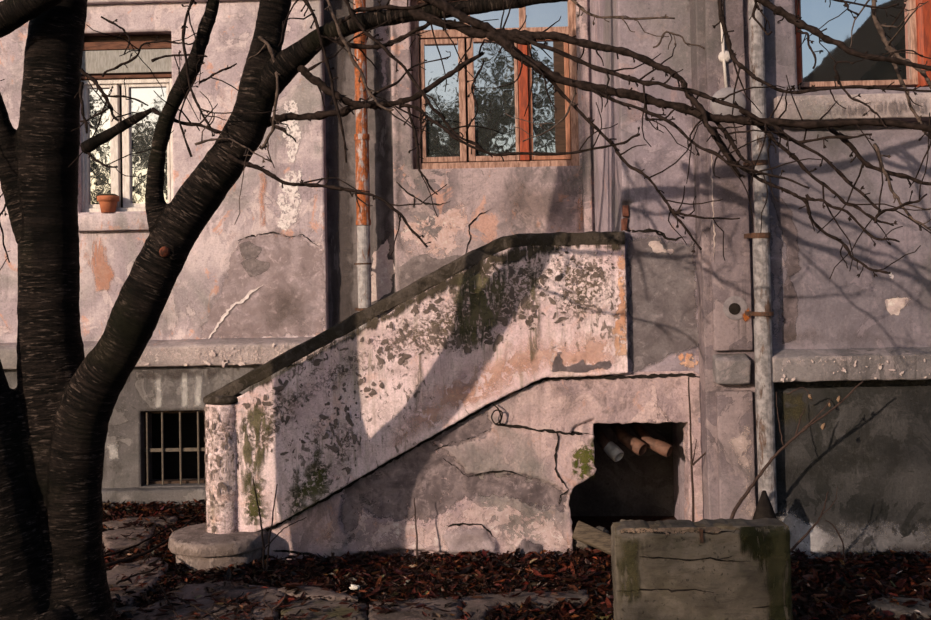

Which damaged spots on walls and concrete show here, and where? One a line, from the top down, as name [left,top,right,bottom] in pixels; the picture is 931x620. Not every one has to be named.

spalling [140,100,326,368]
crack [208,285,263,339]
peeling [371,203,469,302]
spalling [621,205,698,373]
spalling [885,297,909,316]
spalling [204,247,615,553]
crack [266,373,700,558]
leakage [783,513,931,559]